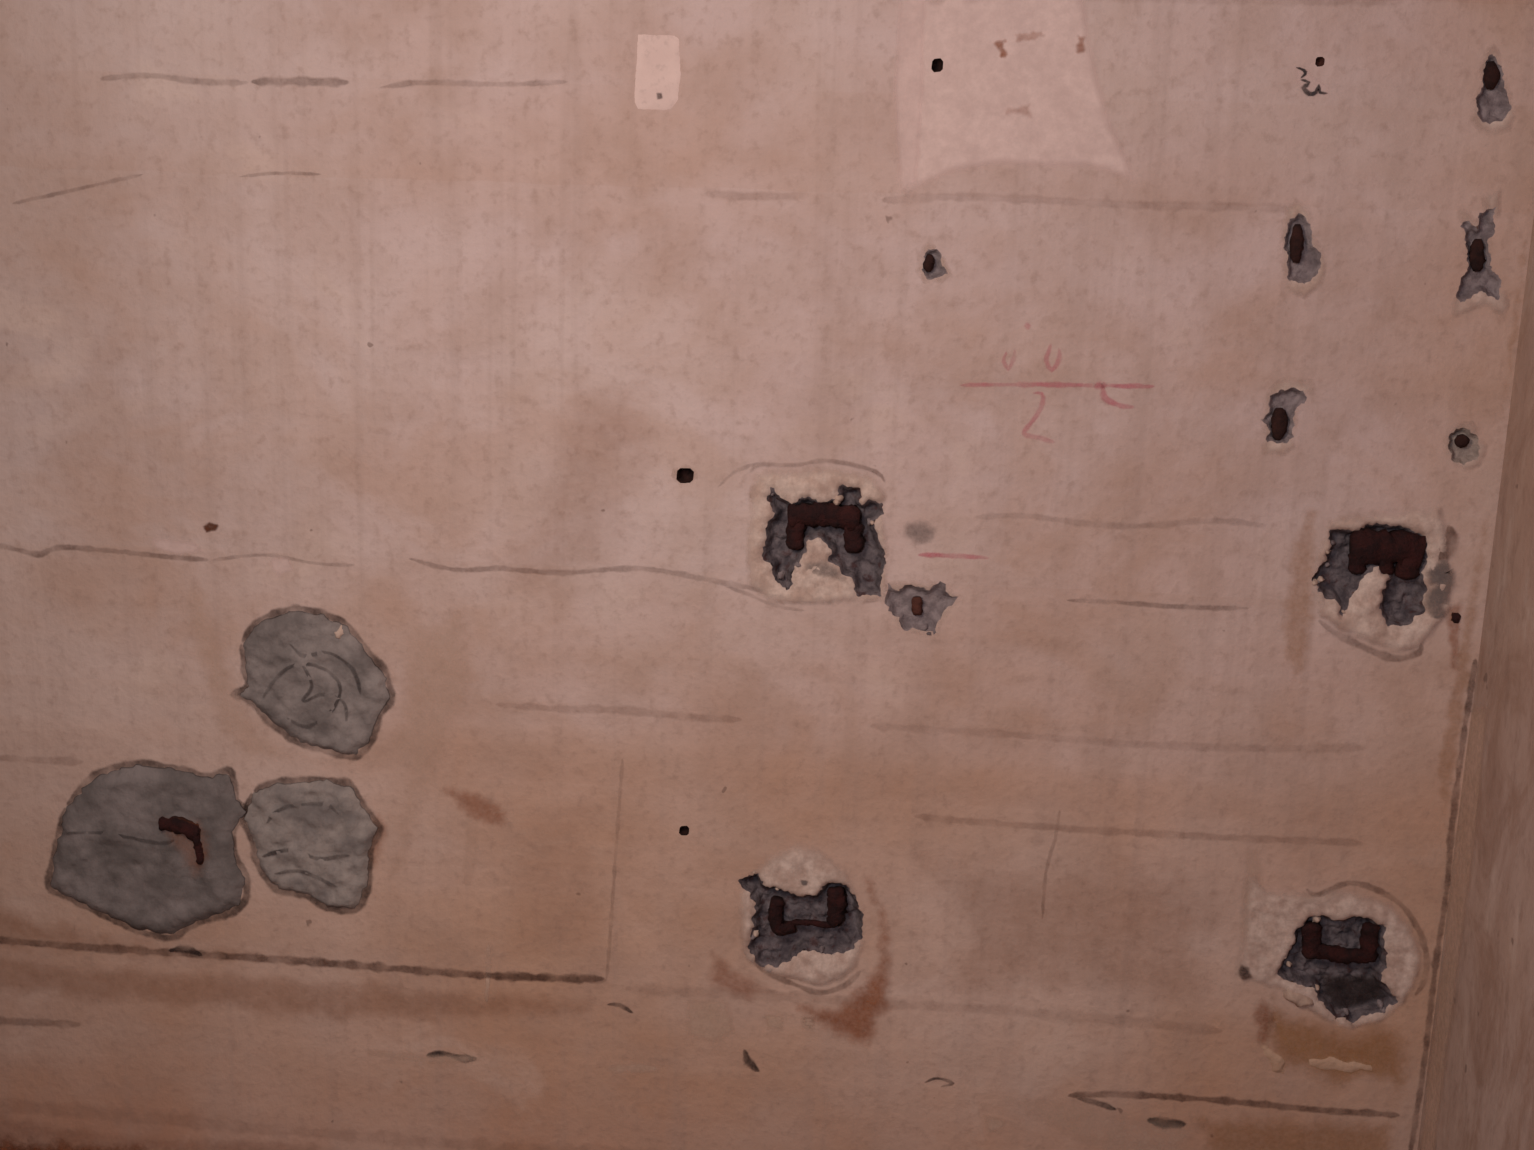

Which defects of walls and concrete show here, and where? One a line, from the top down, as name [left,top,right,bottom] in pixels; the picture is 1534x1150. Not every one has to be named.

spalling [1475,47,1512,130]
spalling [1283,205,1324,295]
spalling [1454,193,1508,315]
spalling [1262,382,1307,452]
spalling [748,469,958,635]
spalling [1312,509,1461,648]
spalling [738,848,864,984]
spalling [1239,882,1417,1027]
spalling [1308,1056,1373,1074]